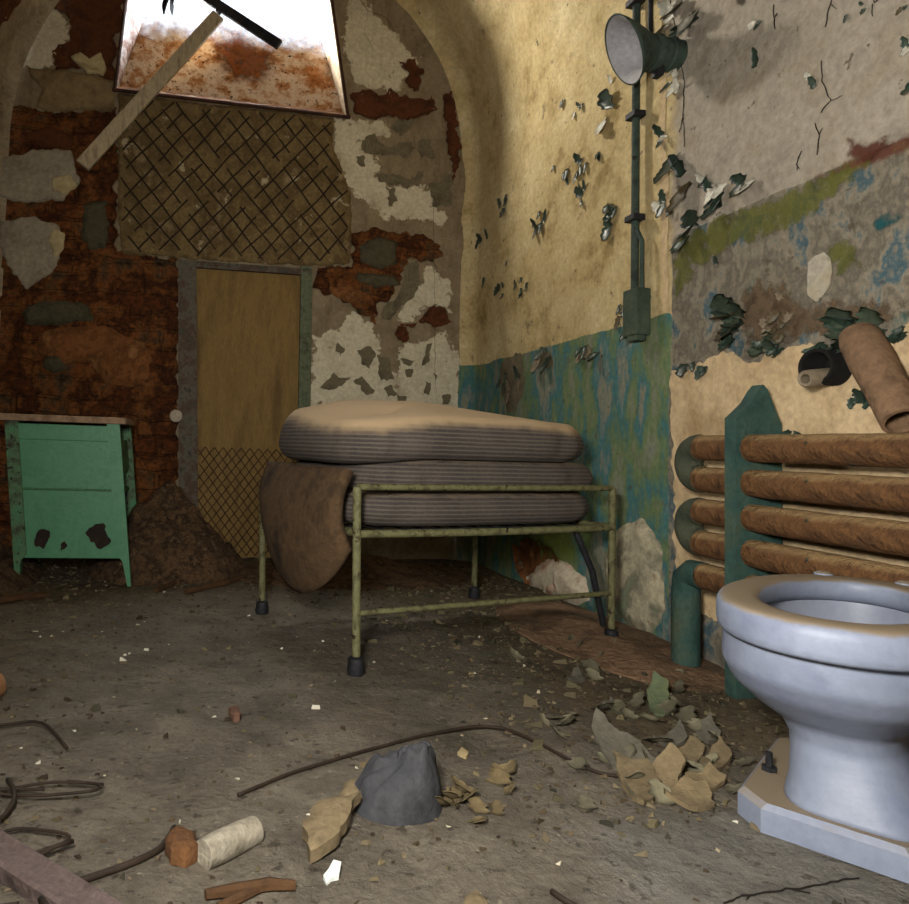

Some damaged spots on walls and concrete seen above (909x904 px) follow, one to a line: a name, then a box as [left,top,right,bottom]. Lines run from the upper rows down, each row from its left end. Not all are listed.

flaking render [0,0,179,549]
flaking render [313,227,452,343]
flaking render [350,58,462,207]
peeling [551,152,601,207]
peeling [594,75,615,136]
peeling [600,203,618,241]
peeling [651,68,756,313]
crack [796,61,843,170]
peeling [807,252,832,301]
peeling [320,343,432,401]
peeling [669,294,909,522]
peeling [672,530,725,569]